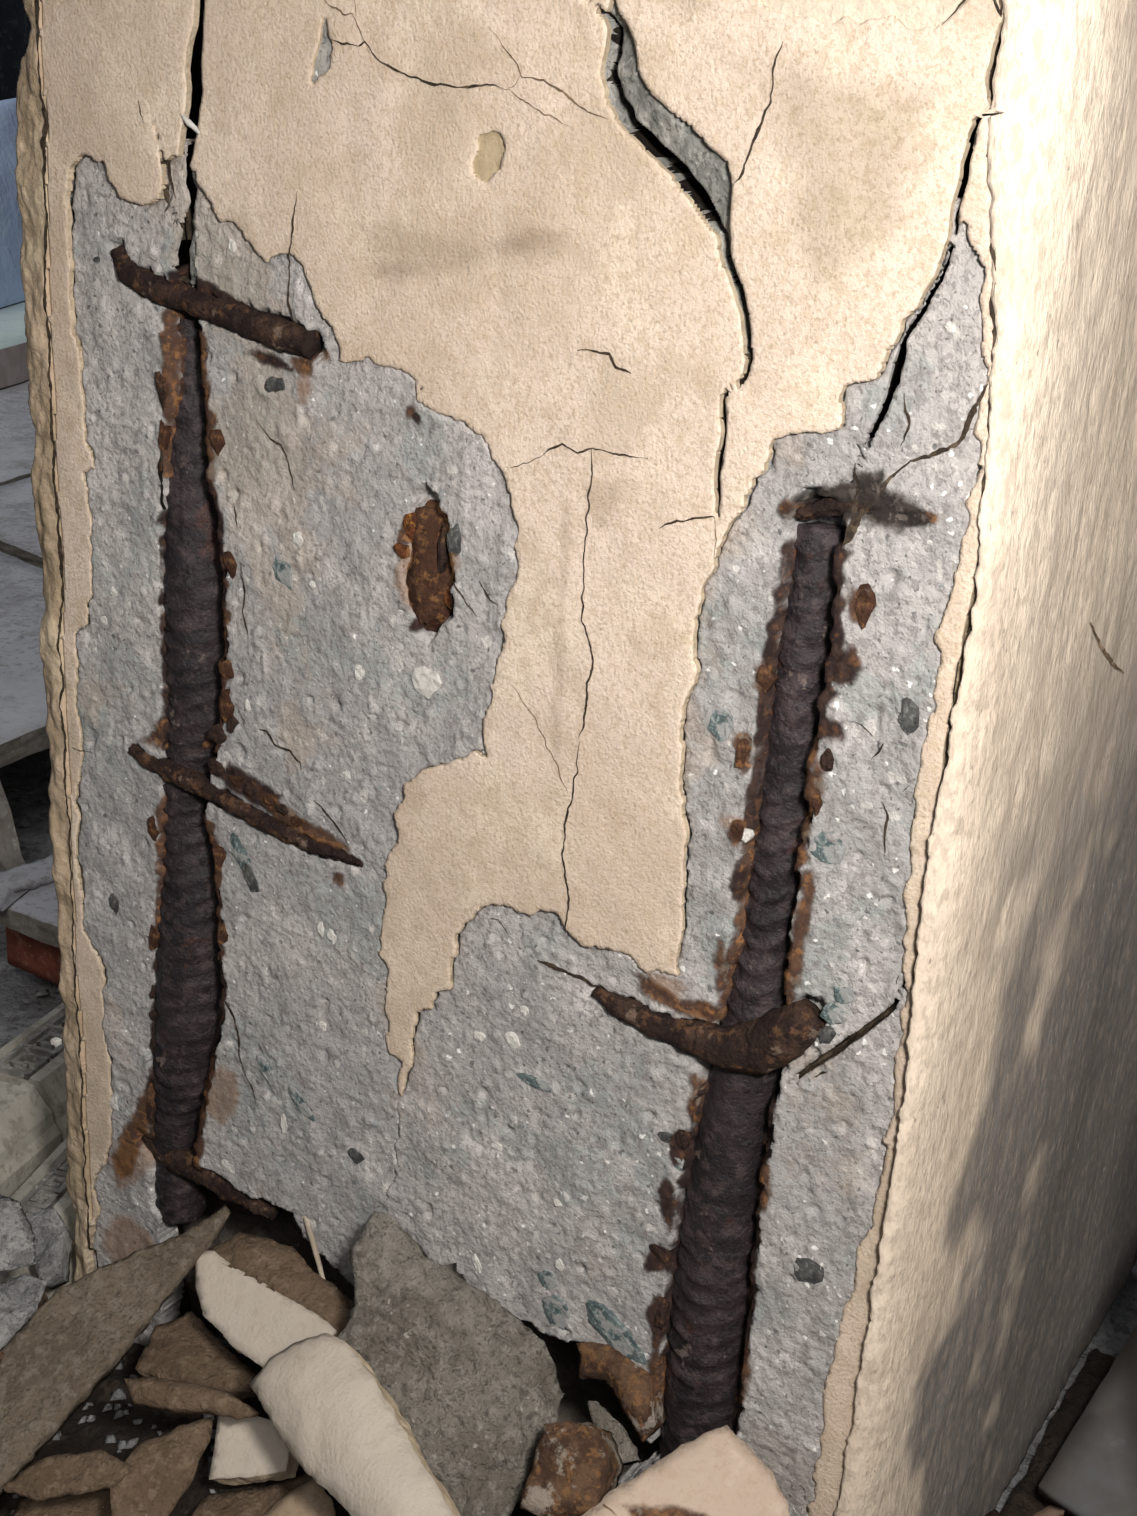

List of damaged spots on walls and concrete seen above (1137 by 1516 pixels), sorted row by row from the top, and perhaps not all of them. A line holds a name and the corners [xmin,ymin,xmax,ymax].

flaking render [474,131,505,183]
crack [326,0,783,554]
crack [842,0,1003,546]
crack [34,0,99,1268]
rust [155,309,350,851]
rust [393,499,455,632]
spalling [70,139,988,1516]
rust [644,1074,709,1406]
rust [637,539,797,1023]
rust [784,542,876,1005]
crack [797,954,918,1079]
crack [881,473,986,852]